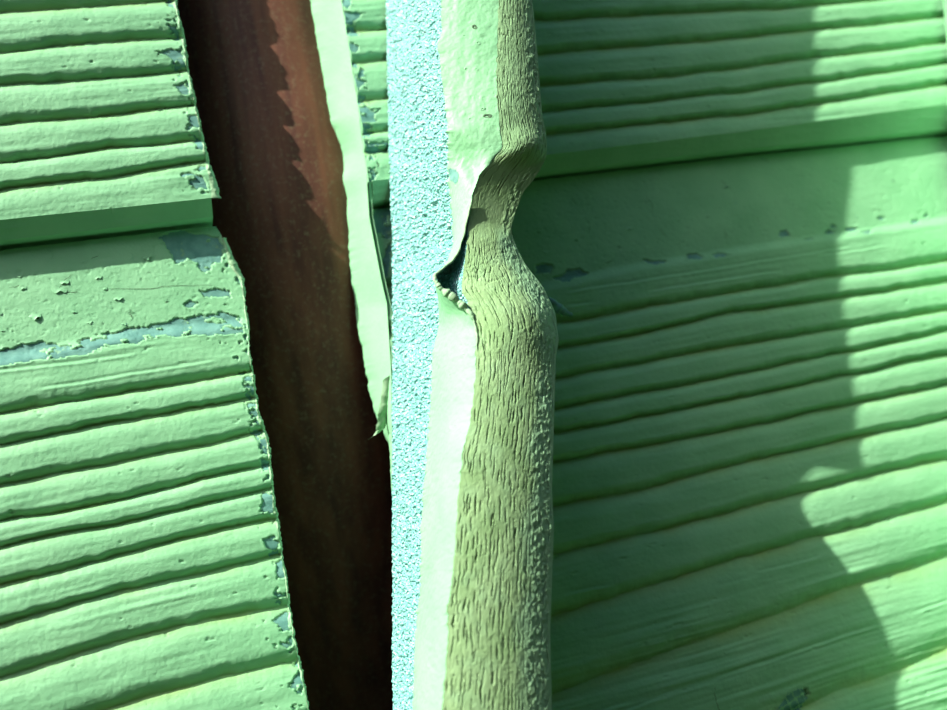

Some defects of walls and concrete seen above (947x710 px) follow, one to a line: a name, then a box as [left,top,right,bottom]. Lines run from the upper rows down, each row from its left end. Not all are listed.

peeling [159,20,203,150]
peeling [181,166,207,194]
peeling [158,230,229,272]
peeling [0,288,247,366]
peeling [238,372,269,480]
peeling [261,493,273,513]
peeling [263,536,292,652]
peeling [290,662,303,694]